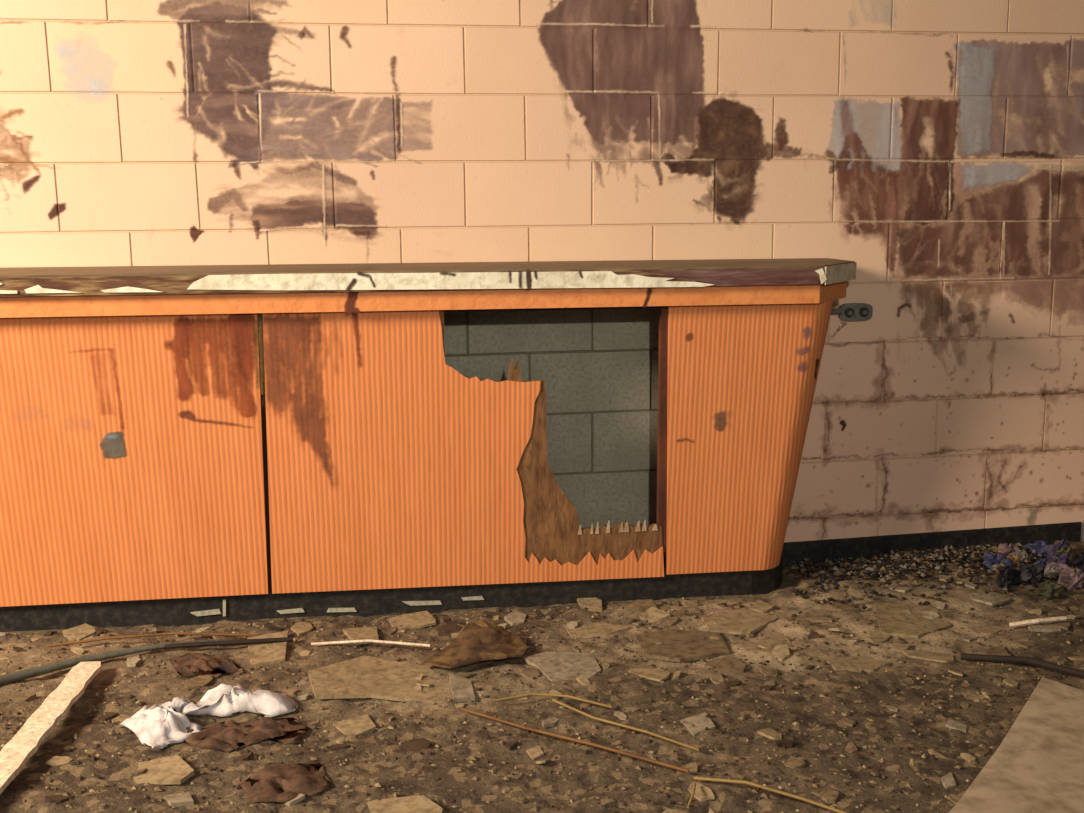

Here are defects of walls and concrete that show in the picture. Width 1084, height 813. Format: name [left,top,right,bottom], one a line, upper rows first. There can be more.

peeling [240,90,334,197]
peeling [22,175,39,192]
peeling [909,160,1051,198]